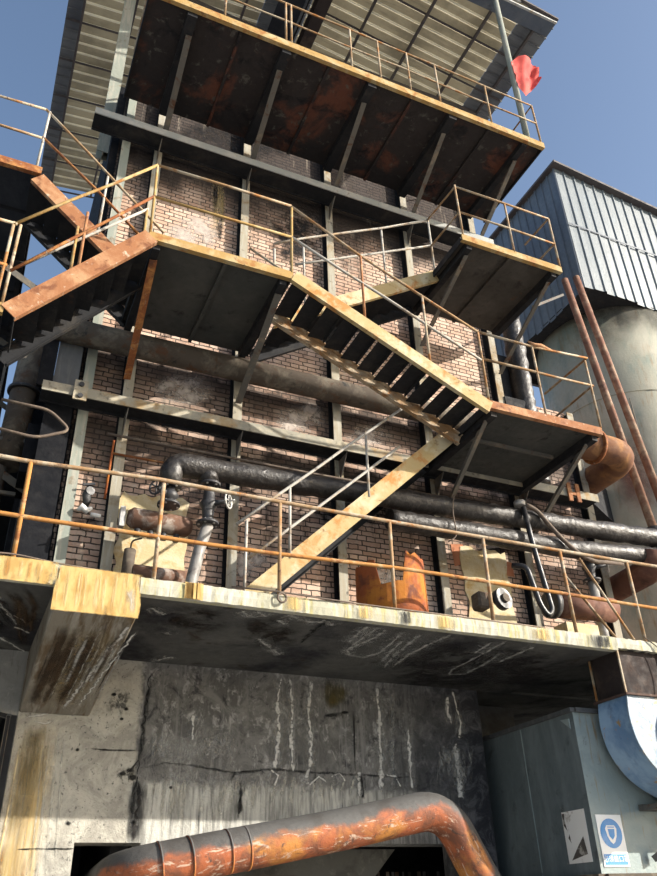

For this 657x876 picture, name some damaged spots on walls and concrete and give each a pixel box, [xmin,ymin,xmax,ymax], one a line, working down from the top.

crack [99,677,412,813]